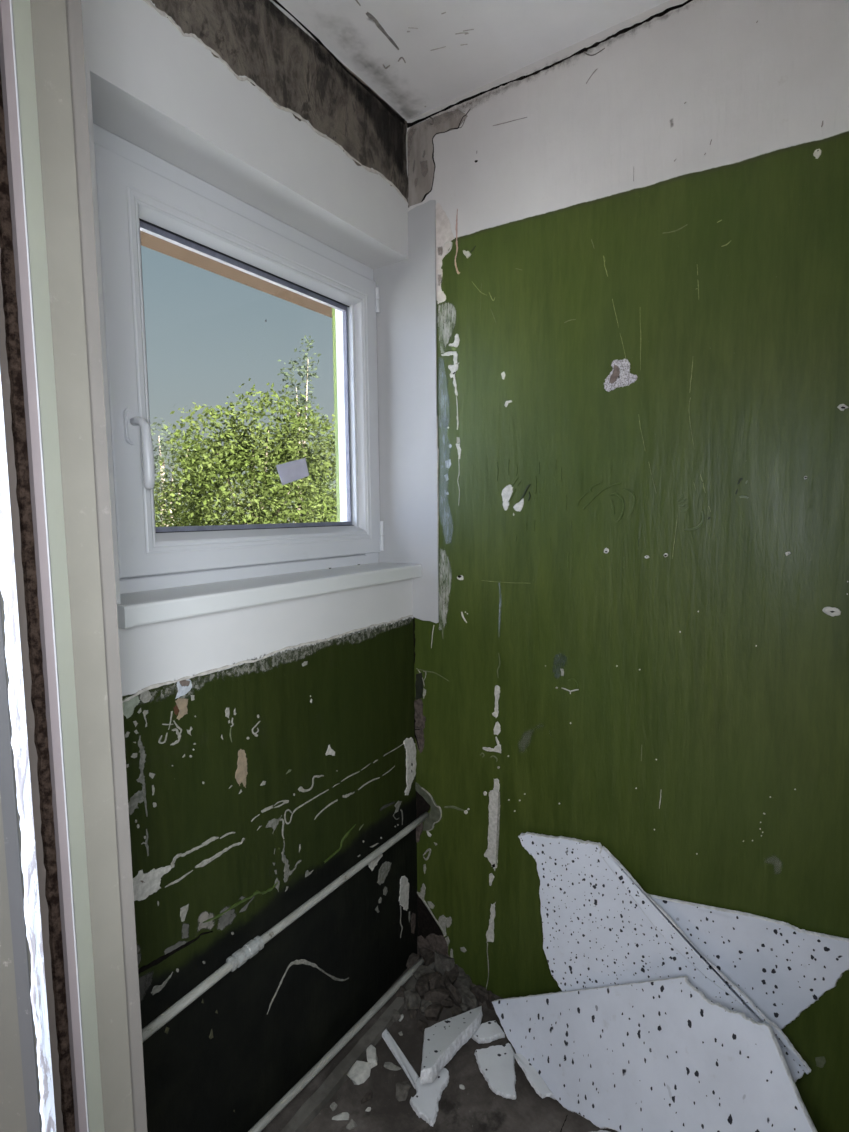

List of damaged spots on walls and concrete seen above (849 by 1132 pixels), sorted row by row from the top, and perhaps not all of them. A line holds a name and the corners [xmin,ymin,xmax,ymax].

crack [273,0,693,208]
peeling [431,203,476,648]
spalling [604,359,638,392]
peeling [0,372,57,1132]
flaking render [133,865,171,906]
flaking render [137,944,179,1003]
flaking render [164,896,255,955]
peeling [122,615,413,856]
spalling [357,673,470,963]
peeling [480,653,501,886]
peeling [486,902,496,989]